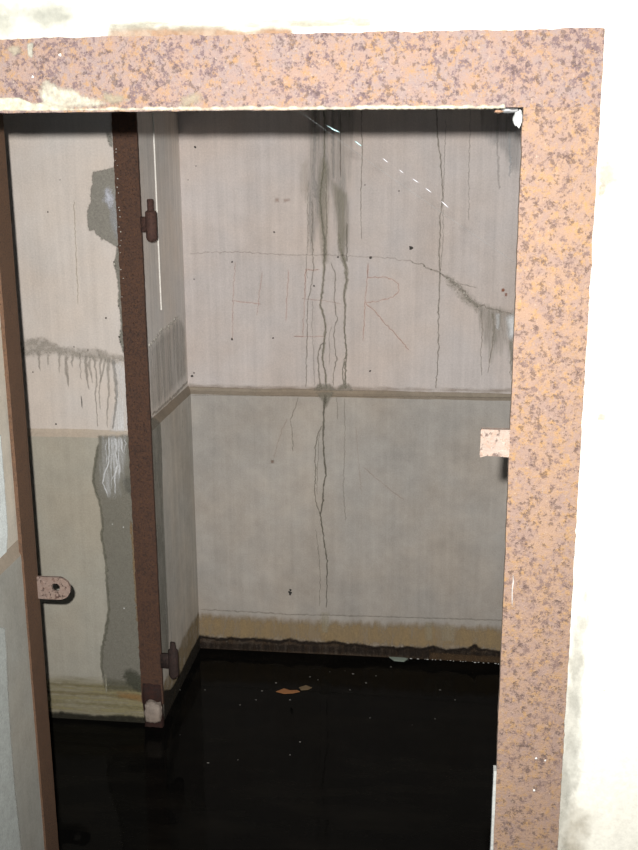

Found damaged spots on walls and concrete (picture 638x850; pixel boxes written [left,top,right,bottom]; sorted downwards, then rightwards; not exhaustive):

corrosion [110,28,292,37]
peeling [86,160,124,351]
crack [314,110,349,606]
water stain [21,340,145,723]
water stain [164,615,501,721]